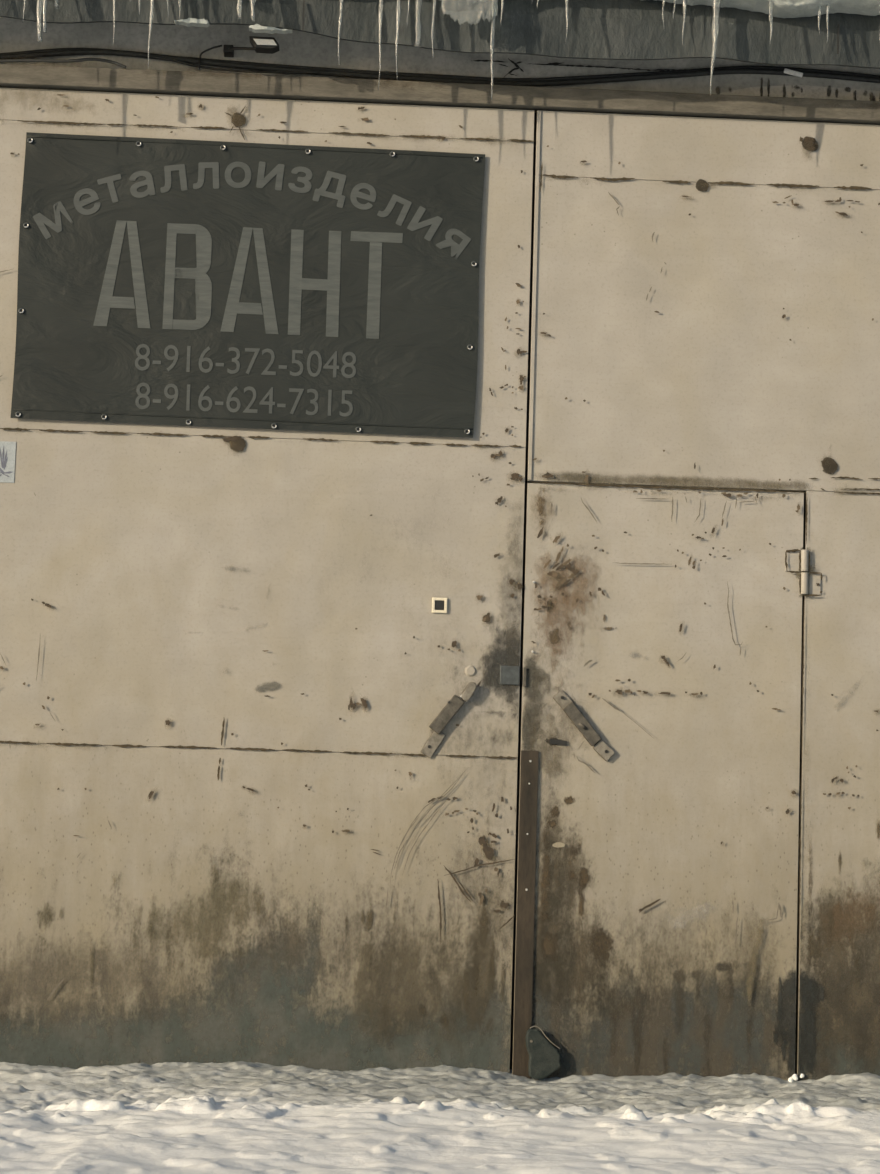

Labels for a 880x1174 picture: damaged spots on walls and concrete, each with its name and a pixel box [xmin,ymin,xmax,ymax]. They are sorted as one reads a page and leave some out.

corrosion [540,166,578,192]
corrosion [662,179,819,191]
corrosion [800,136,818,151]
corrosion [532,457,880,597]
corrosion [538,559,588,654]
water stain [0,919,511,1073]
water stain [532,959,880,1081]